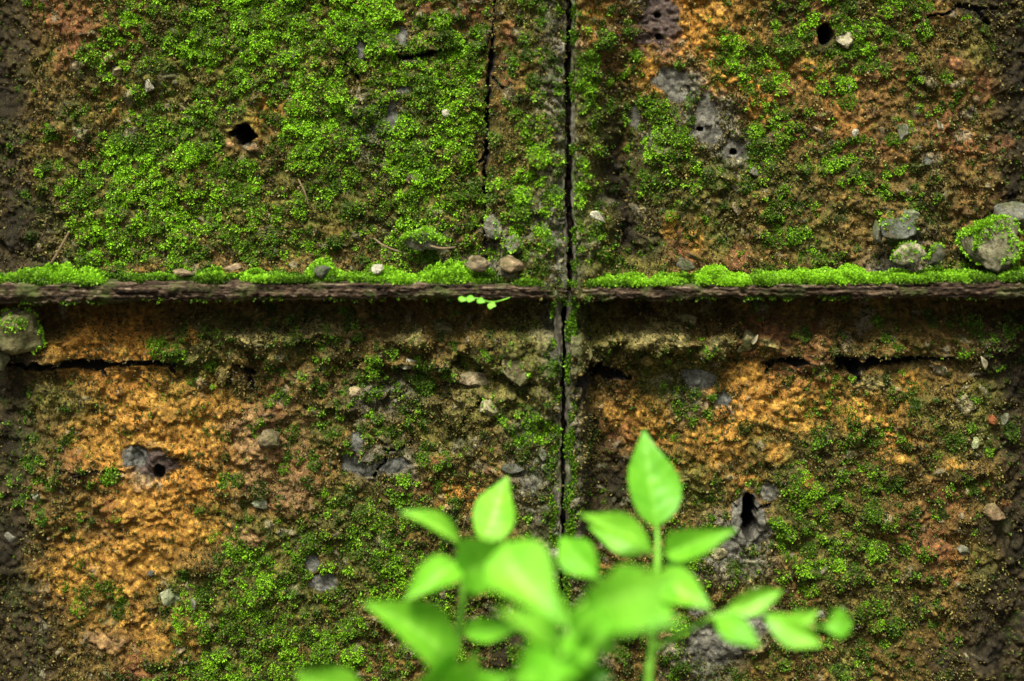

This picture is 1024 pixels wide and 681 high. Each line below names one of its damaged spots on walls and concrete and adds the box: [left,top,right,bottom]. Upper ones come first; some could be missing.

crack [478,0,505,260]
crack [7,358,177,377]
crack [760,353,953,386]